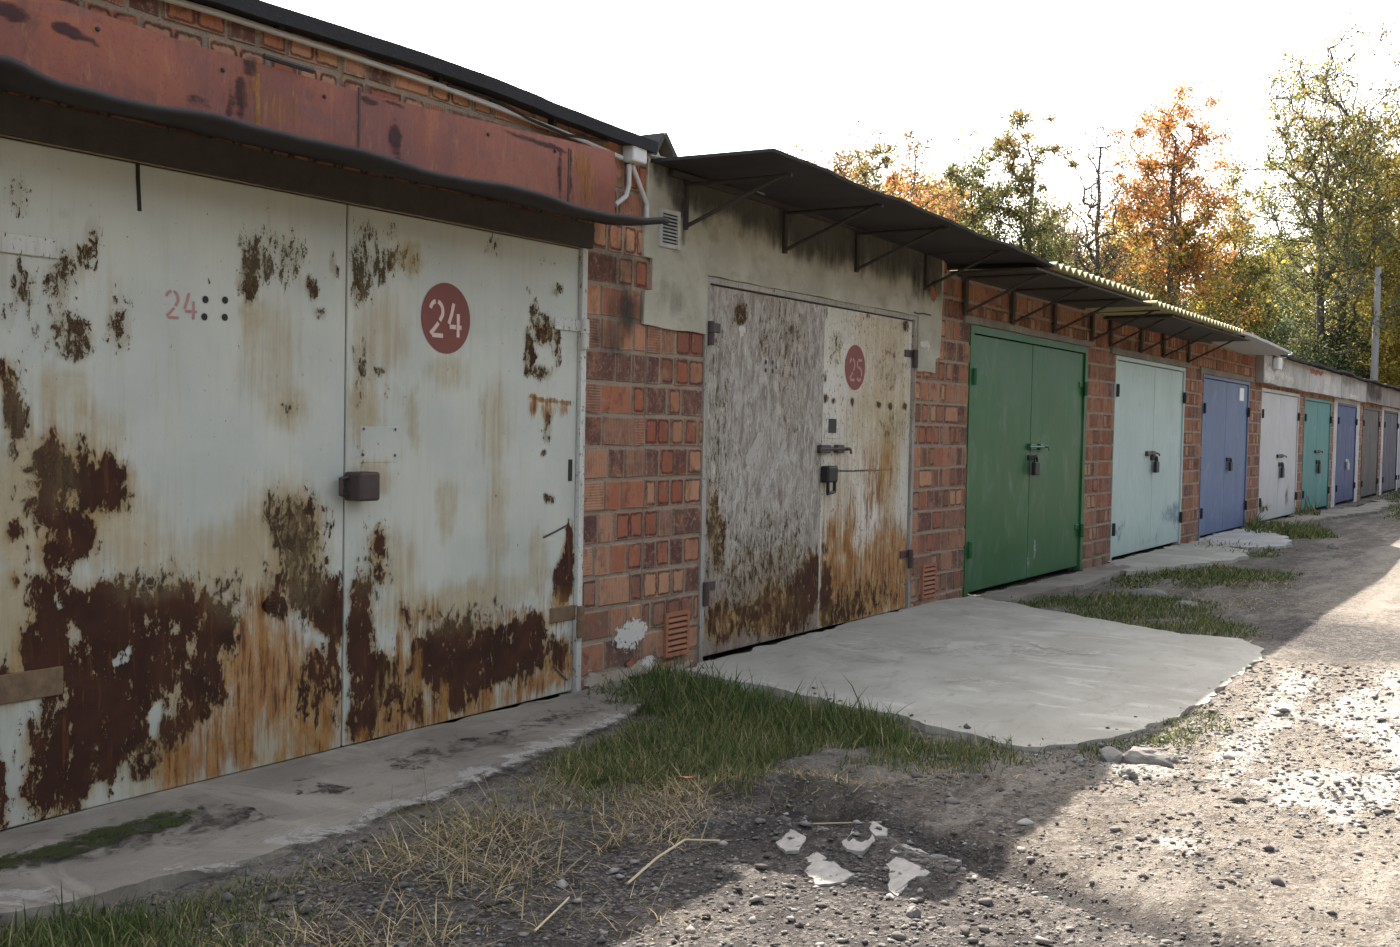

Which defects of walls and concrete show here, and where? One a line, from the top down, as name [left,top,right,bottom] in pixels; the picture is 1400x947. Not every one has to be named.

corrosion [227,57,260,125]
corrosion [389,125,402,160]
corrosion [530,394,571,456]
corrosion [704,453,911,653]
corrosion [0,419,574,829]